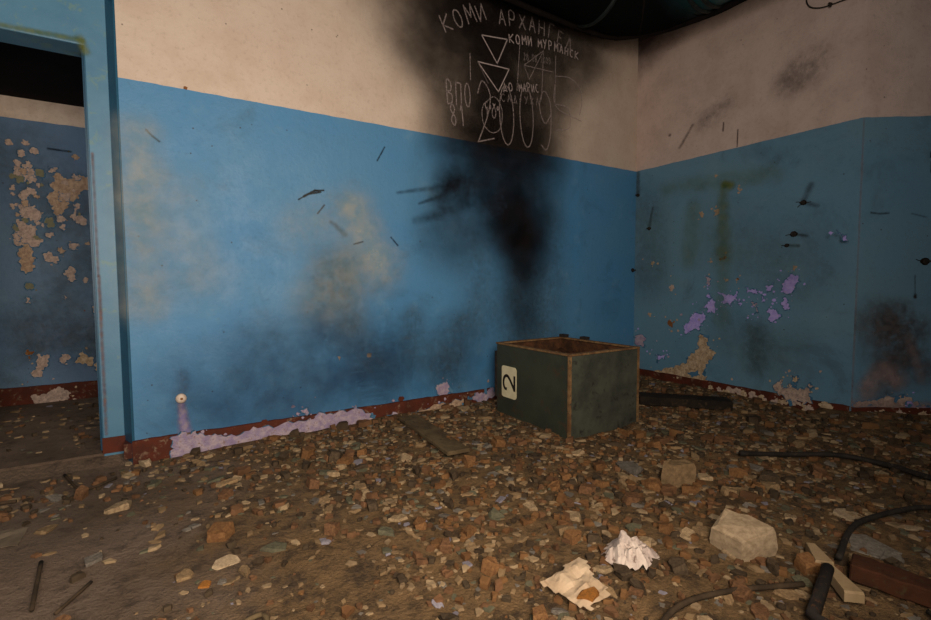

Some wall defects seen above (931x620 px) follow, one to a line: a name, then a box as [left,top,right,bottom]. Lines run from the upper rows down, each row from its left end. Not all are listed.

peeling [4,139,90,304]
peeling [633,266,833,411]
peeling [24,347,97,404]
peeling [169,396,404,458]
peeling [417,378,495,412]
peeling [852,392,931,415]